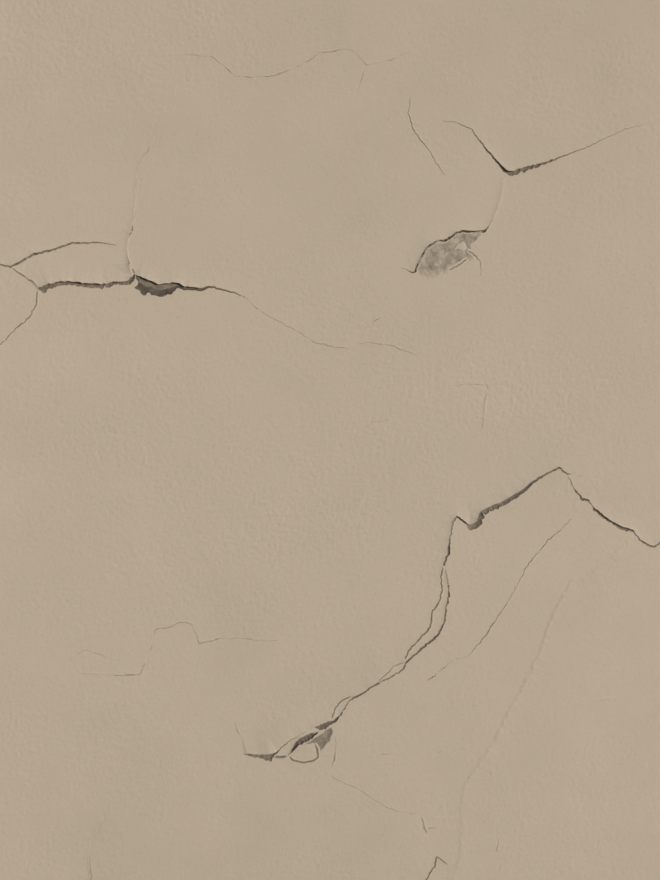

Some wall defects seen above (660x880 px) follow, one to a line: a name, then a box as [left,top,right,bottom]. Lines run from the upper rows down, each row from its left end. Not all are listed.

crack [173,48,413,92]
crack [407,96,446,176]
crack [443,112,640,177]
crack [0,130,417,357]
flaking render [402,175,508,279]
crack [66,620,279,677]
crack [233,449,660,833]
flaking render [286,727,333,765]